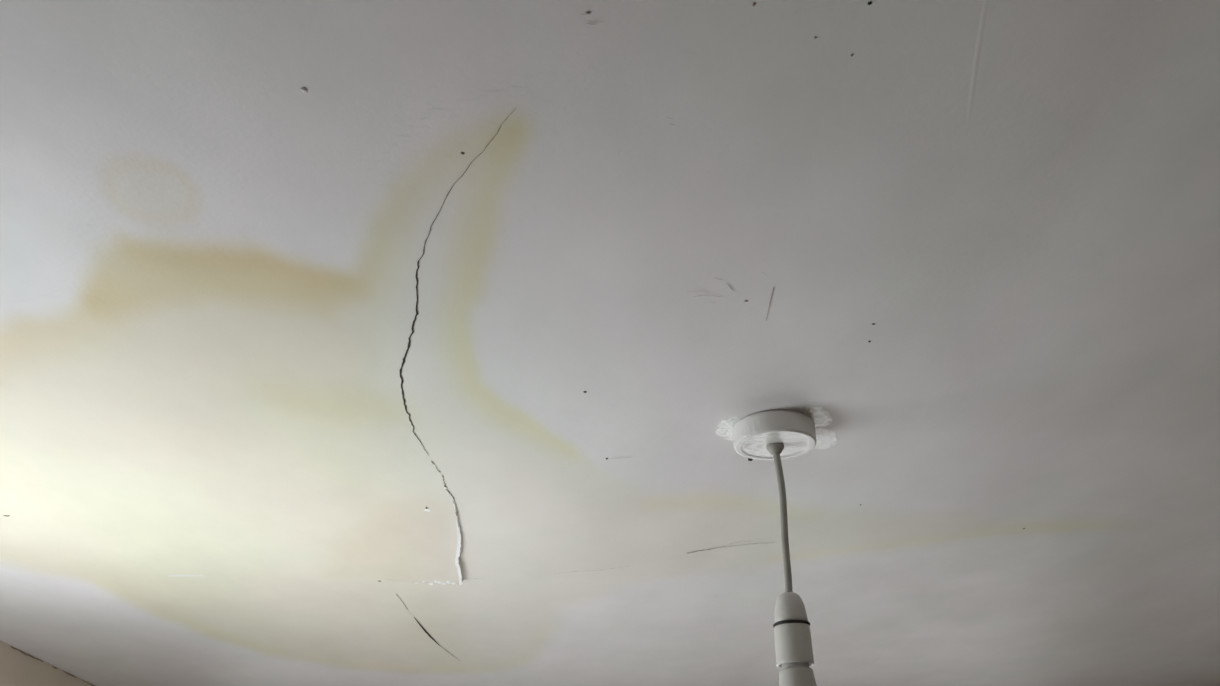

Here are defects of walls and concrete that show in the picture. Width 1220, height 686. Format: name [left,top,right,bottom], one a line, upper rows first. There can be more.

damp [0,86,784,677]
crack [387,108,516,660]
damp [786,494,1160,568]